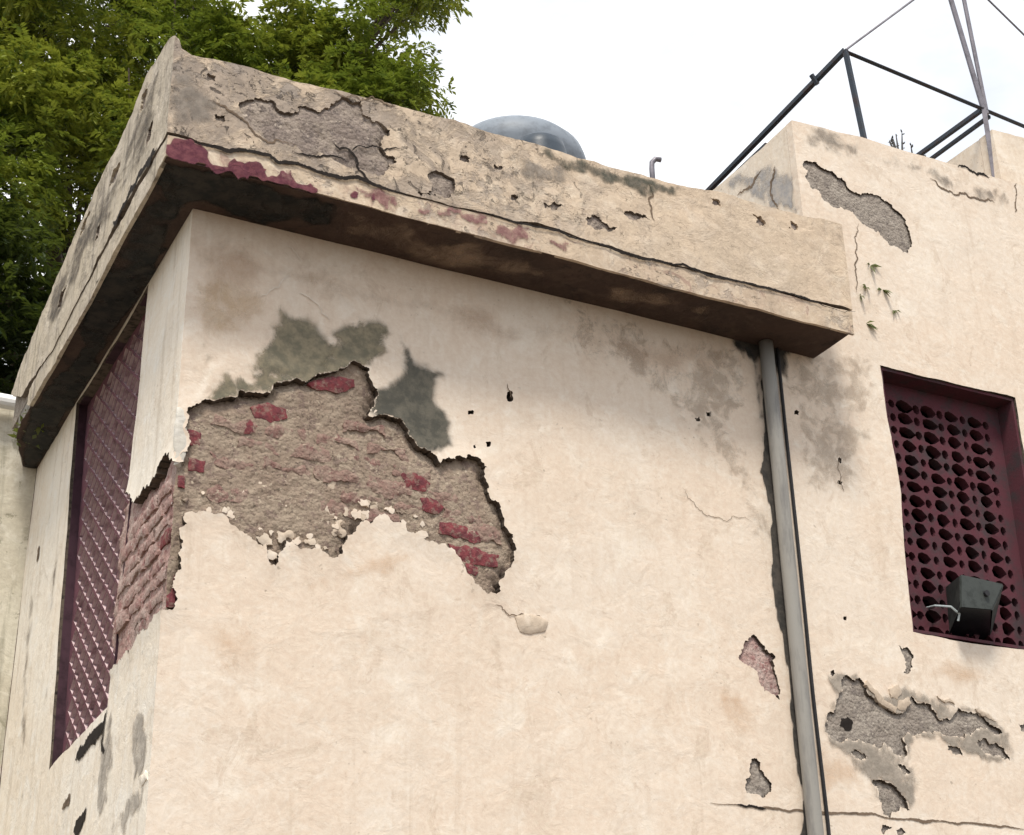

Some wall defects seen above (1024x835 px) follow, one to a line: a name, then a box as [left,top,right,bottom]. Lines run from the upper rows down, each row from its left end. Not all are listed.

leakage [127,75,157,162]
peeling [166,138,318,193]
crack [193,100,407,195]
spalling [803,162,911,253]
crack [932,165,1017,212]
crack [474,211,859,312]
leakage [21,164,333,468]
leakage [211,312,388,400]
leakage [372,349,450,450]
spalling [112,363,513,664]
spalling [825,671,1007,775]
crack [713,803,1024,830]